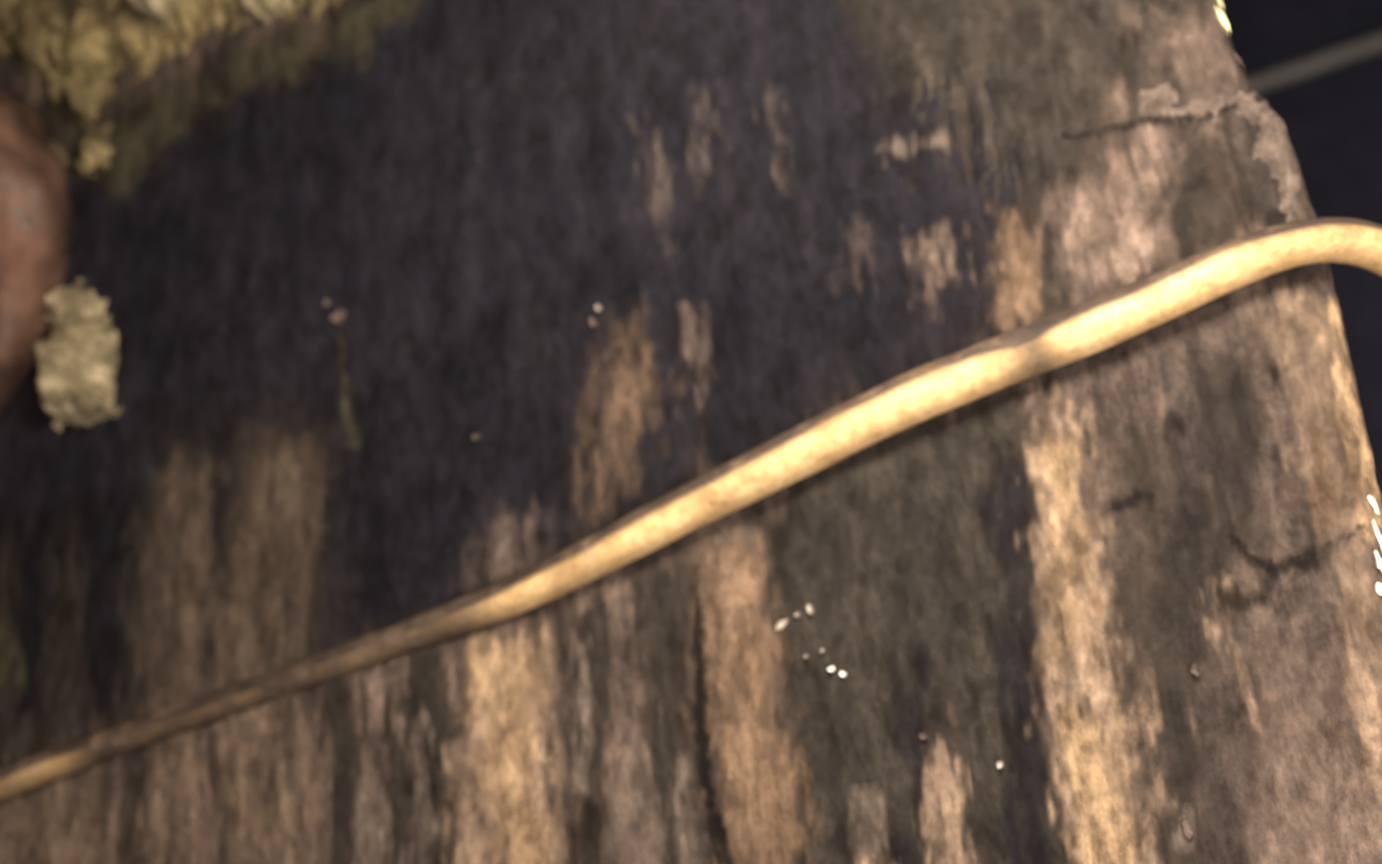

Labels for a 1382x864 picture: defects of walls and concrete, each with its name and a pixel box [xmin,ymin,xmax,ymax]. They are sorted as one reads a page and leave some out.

crack [1064,96,1257,137]
crack [1111,490,1151,509]
crack [1235,526,1360,610]